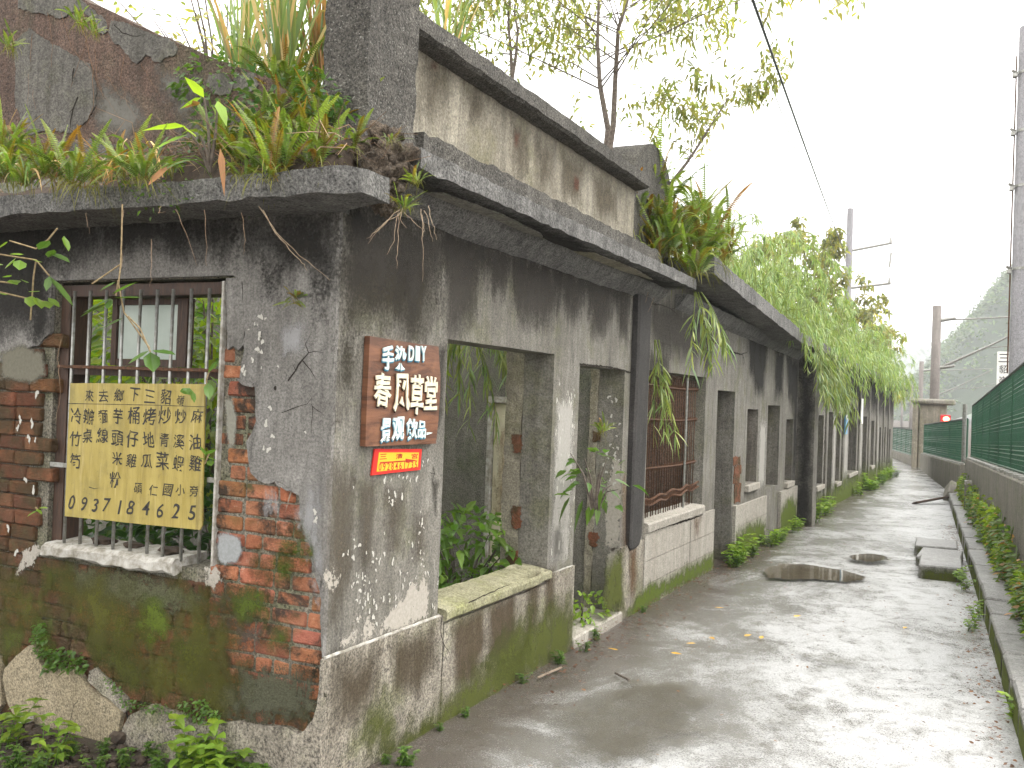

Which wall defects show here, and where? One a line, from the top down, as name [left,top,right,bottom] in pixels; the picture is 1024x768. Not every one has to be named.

flaking render [14,28,146,177]
flaking render [18,0,259,150]
leakage [407,178,600,255]
leakage [0,207,630,341]
flaking render [1,345,46,399]
crack [281,332,323,426]
leakage [341,342,355,390]
flaking render [14,544,41,576]
flaking render [204,314,438,731]
leakage [395,632,434,689]
leakage [455,597,514,681]
leakage [529,569,554,633]